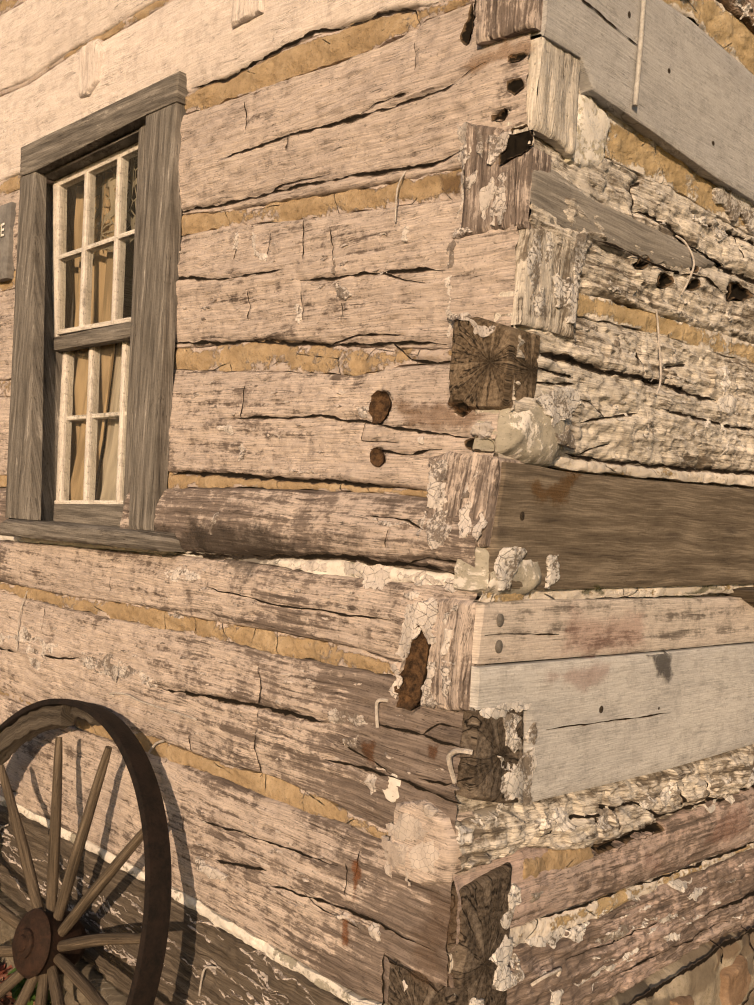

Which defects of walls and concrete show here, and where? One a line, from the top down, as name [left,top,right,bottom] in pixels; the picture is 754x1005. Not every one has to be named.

crack [220,62,485,160]
crack [175,333,447,364]
peeling [536,386,581,449]
peeling [343,560,459,708]
peeling [455,700,538,845]
crack [536,781,754,837]
peeling [0,825,68,900]
peeling [166,938,315,1005]
peeling [332,910,381,942]
peeling [489,883,608,991]
crack [566,923,656,960]
crack [618,890,754,1005]